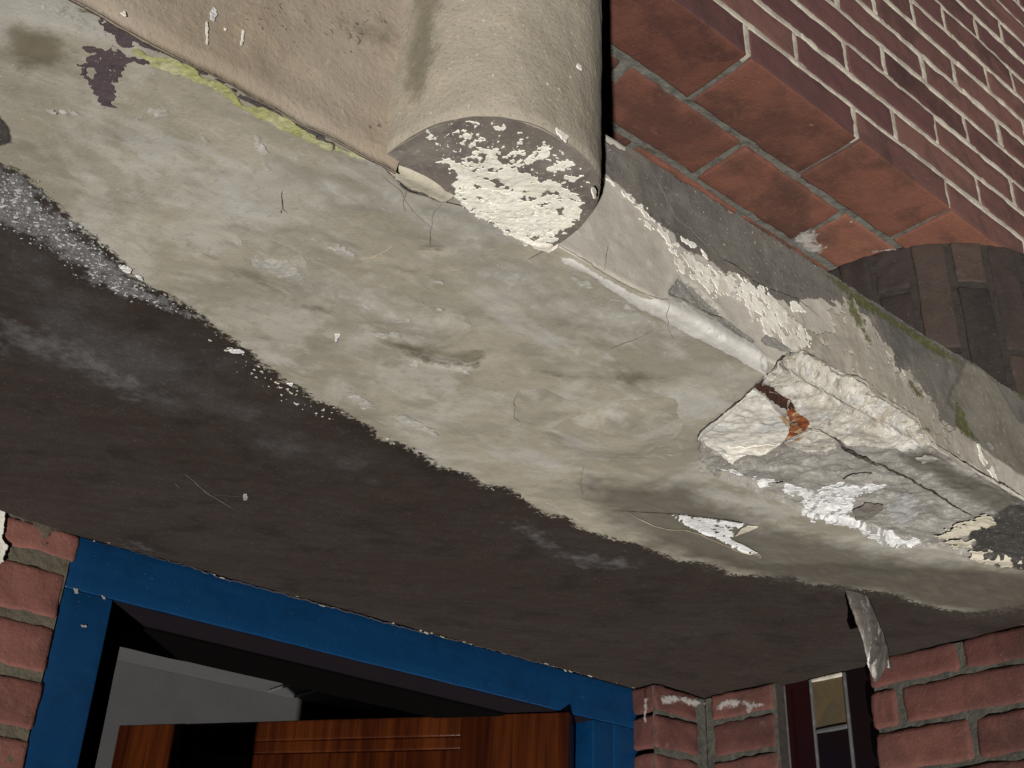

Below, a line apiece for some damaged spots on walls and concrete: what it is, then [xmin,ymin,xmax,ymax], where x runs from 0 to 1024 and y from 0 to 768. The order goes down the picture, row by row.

peeling [205,6,227,45]
leakage [0,167,192,318]
leakage [252,258,303,284]
crack [382,167,510,243]
peeling [426,121,597,246]
leakage [795,231,821,252]
peeling [601,140,1024,569]
corrosion [755,384,810,443]
crack [697,350,1022,496]
leakage [948,361,1024,475]
leakage [718,467,921,549]
crack [804,427,972,516]